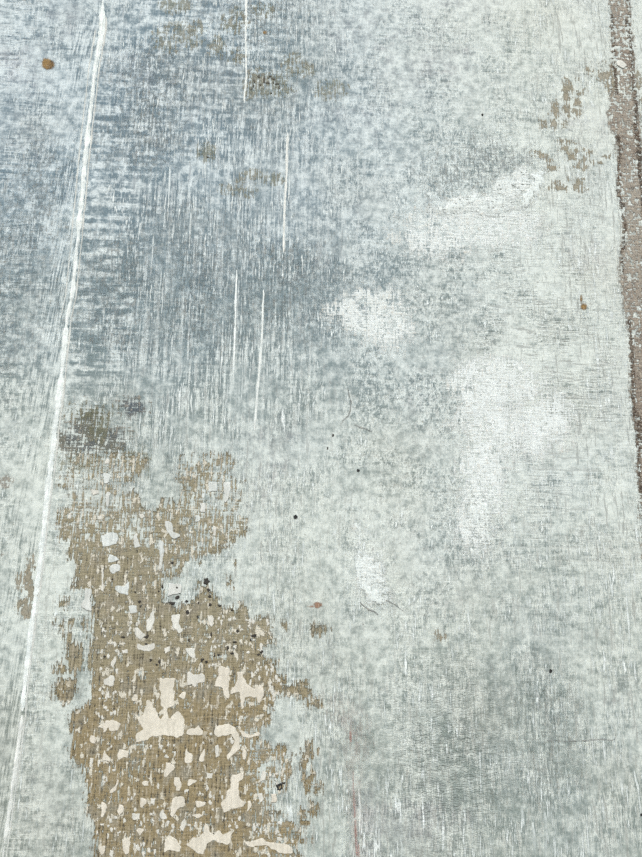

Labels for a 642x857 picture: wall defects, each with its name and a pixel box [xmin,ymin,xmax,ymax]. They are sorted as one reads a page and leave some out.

rust [42,58,54,69]
peeling [529,0,642,519]
peeling [49,450,327,857]
peeling [310,620,332,639]